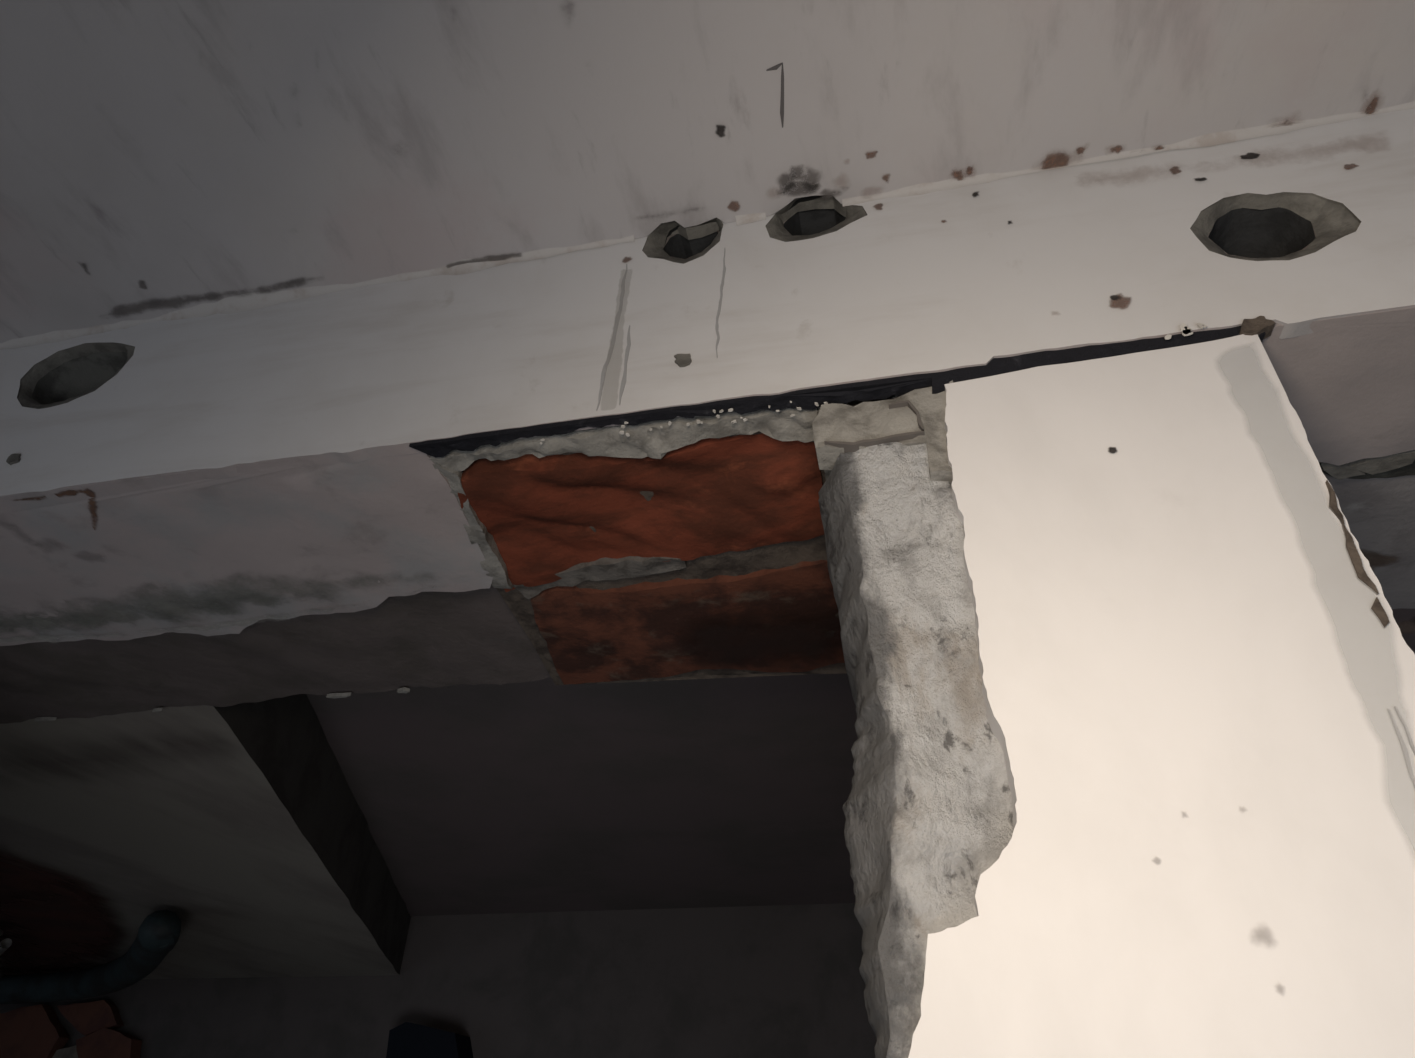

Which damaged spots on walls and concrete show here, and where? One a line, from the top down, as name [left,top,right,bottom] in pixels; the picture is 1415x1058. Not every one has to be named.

corrosion [1043,148,1084,169]
corrosion [1110,294,1130,309]
corrosion [16,489,97,530]
spalling [1325,480,1389,629]
flaking render [429,380,1014,1058]